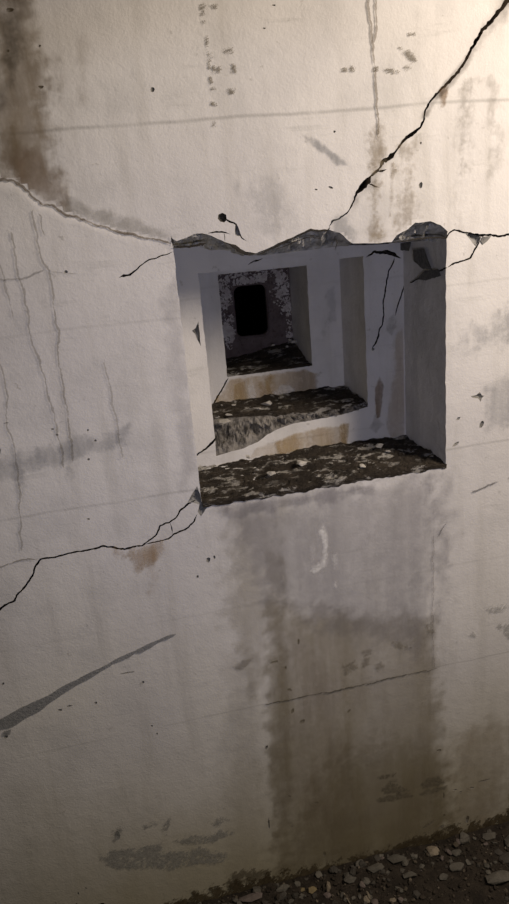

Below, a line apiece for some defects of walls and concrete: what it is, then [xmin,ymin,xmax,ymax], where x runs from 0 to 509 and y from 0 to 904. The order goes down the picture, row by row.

crack [0,0,509,278]
peeling [218,269,293,350]
spalling [171,224,352,256]
spalling [386,221,447,280]
crack [367,229,509,348]
spalling [213,402,368,456]
crack [0,500,197,610]
efflorescence [312,525,328,573]